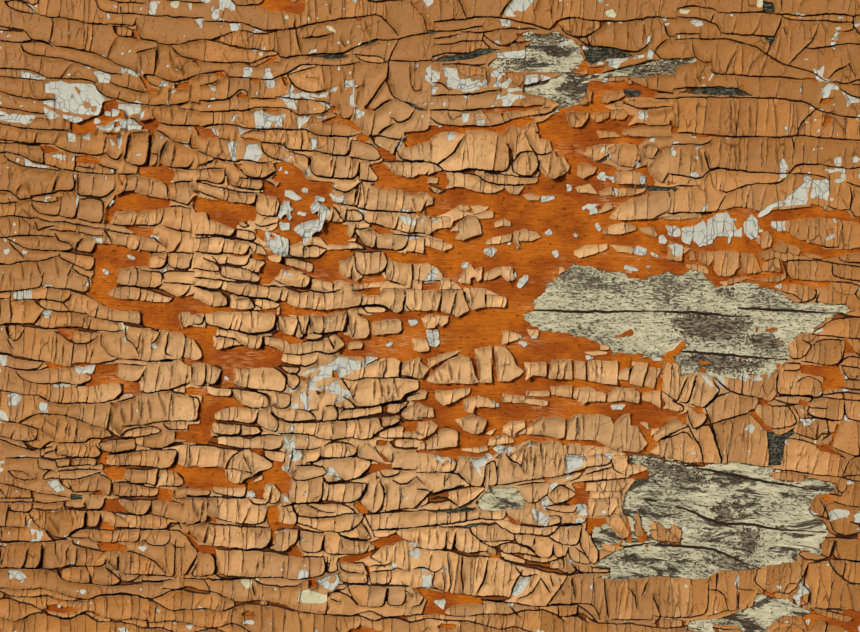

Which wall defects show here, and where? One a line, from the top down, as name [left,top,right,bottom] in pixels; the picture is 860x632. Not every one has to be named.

crack [0,68,96,83]
crack [203,0,860,175]
crack [0,152,115,201]
peeling [304,204,494,258]
peeling [283,278,434,353]
peeling [339,251,507,317]
peeling [427,346,493,384]
peeling [523,263,860,475]
crack [280,406,397,424]
peeling [541,413,648,539]
crack [216,557,328,580]
peeling [754,538,860,632]